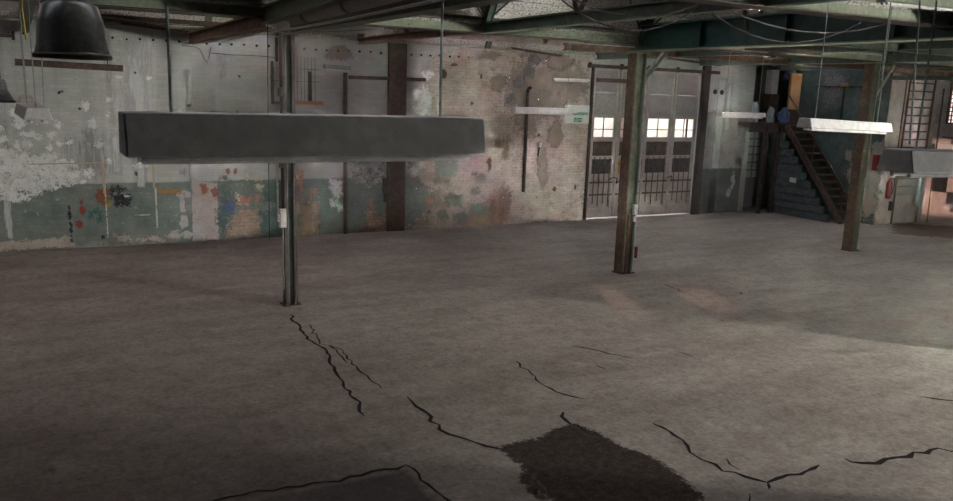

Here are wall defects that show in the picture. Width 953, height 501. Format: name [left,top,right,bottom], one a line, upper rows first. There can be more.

peeling [0,108,95,204]
peeling [405,47,596,230]
peeling [328,162,387,232]
crack [289,314,381,416]
crack [407,465,451,501]
crack [407,397,504,450]
crack [516,361,589,434]
crack [653,423,820,501]
crack [845,447,953,465]